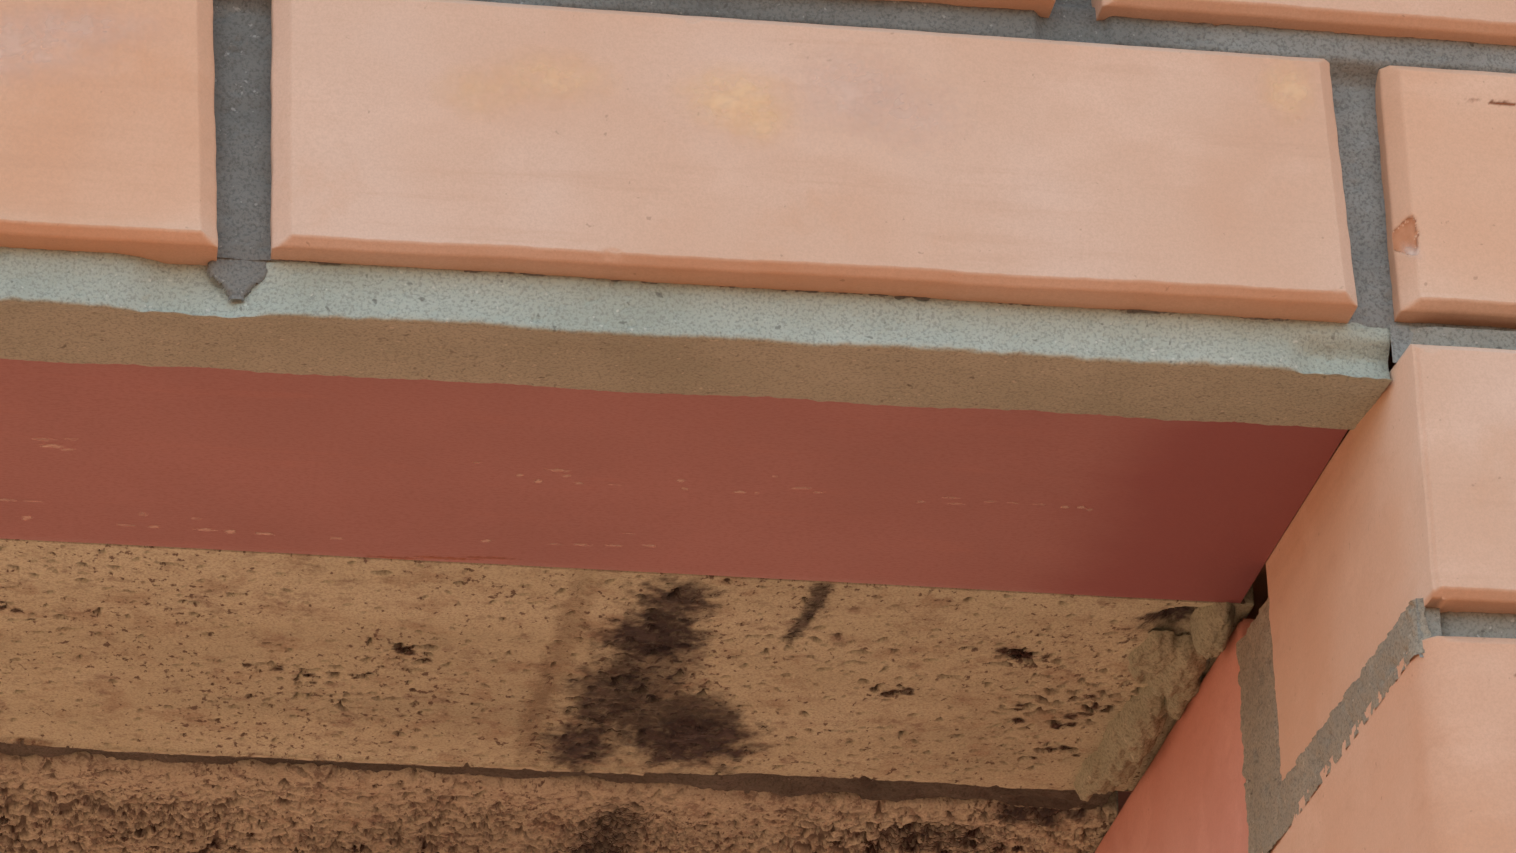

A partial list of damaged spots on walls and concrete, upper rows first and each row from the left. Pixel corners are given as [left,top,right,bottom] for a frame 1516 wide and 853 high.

spalling [1392,217,1419,255]
damp [788,583,830,643]
damp [537,578,762,774]